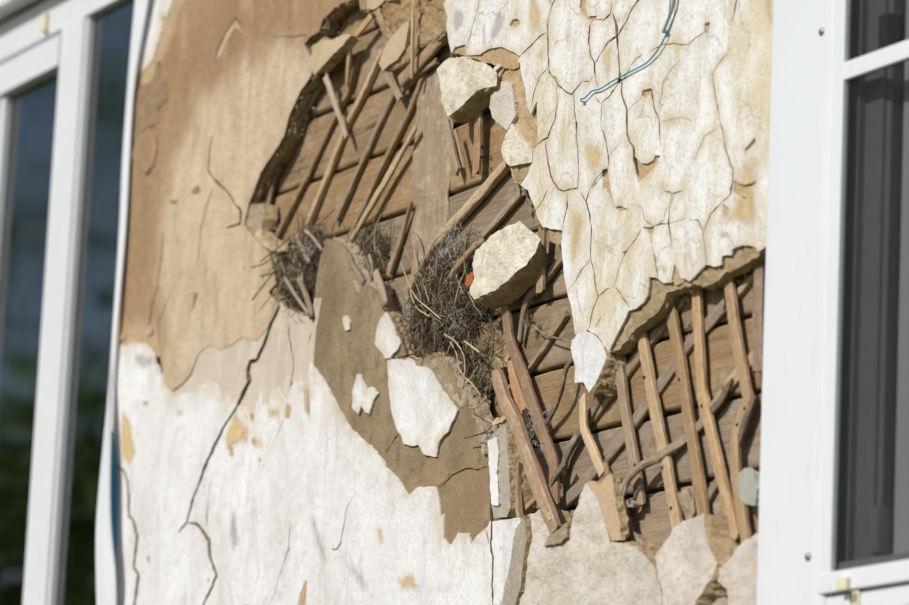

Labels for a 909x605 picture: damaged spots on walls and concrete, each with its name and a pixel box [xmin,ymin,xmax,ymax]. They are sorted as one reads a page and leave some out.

peeling [581,0,597,21]
crack [149,136,242,341]
peeling [117,0,538,545]
spalling [541,225,562,246]
peeling [604,170,628,211]
crack [522,0,733,331]
peeling [637,155,660,181]
spalling [612,246,766,356]
peeling [735,182,756,199]
crack [117,466,140,605]
crack [178,306,312,605]
peeling [736,468,760,507]